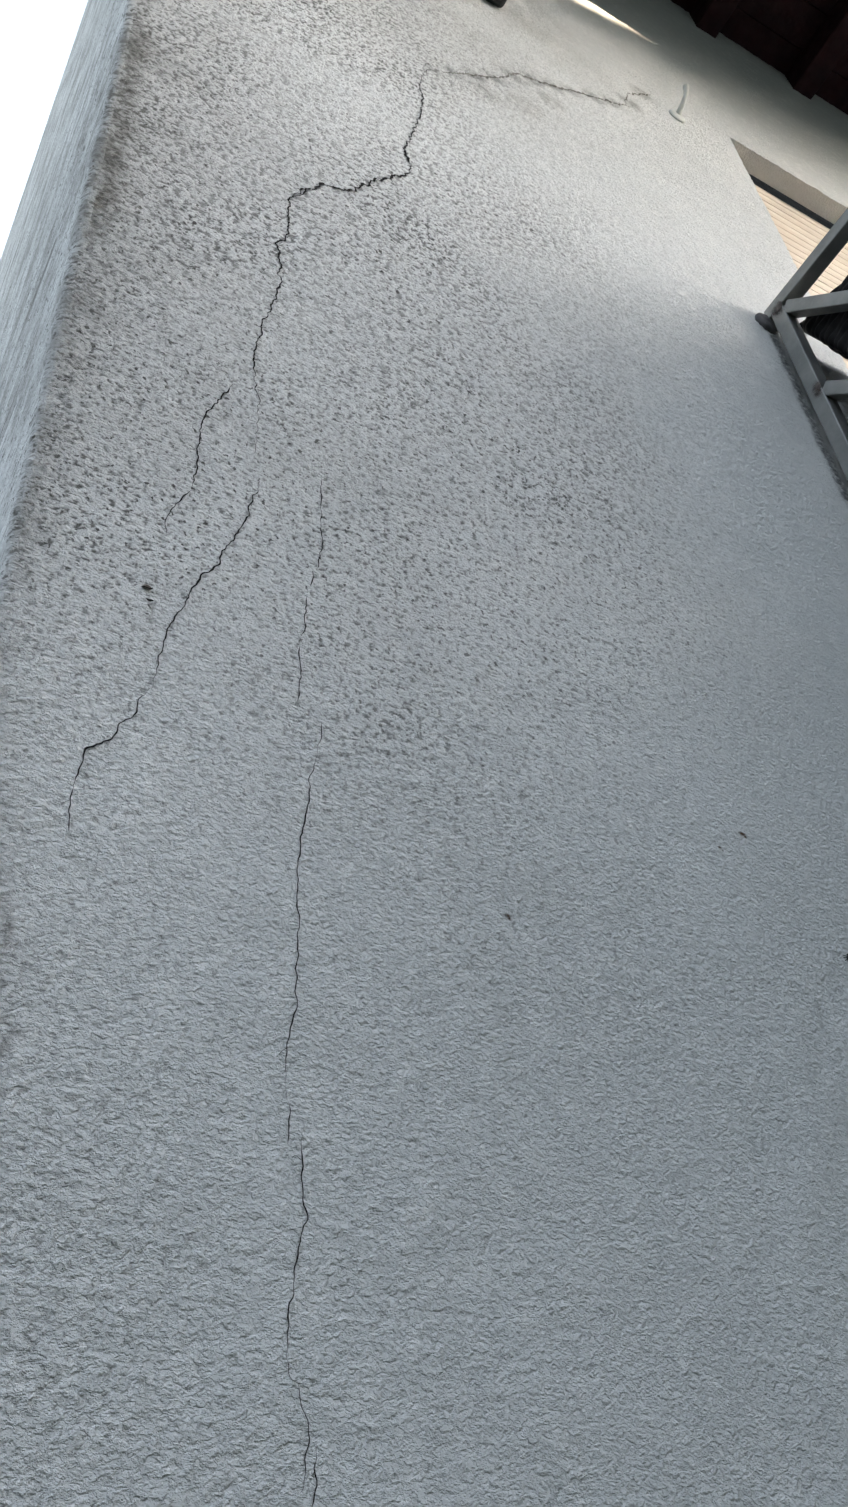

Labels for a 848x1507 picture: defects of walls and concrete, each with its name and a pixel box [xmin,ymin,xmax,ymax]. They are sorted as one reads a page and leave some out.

crack [165,69,651,532]
crack [68,492,258,828]
crack [280,479,323,1507]